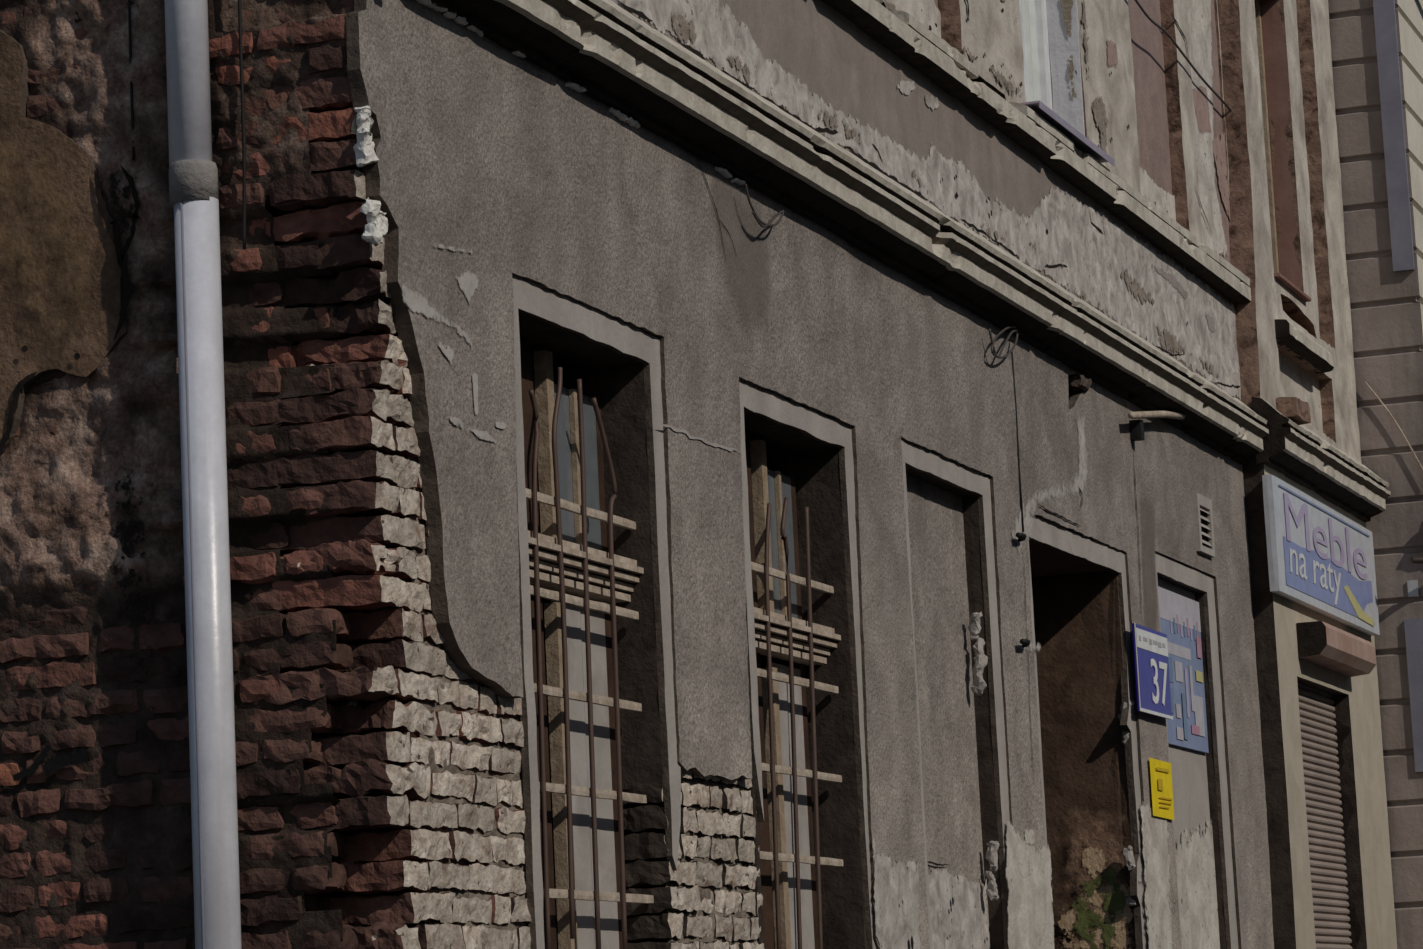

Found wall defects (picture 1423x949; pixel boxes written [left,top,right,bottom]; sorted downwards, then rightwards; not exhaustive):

flaking render [416,0,484,37]
flaking render [565,82,587,92]
peeling [609,0,1241,401]
flaking render [247,77,532,949]
crack [659,424,742,454]
flaking render [968,612,988,695]
flaking render [622,770,764,949]
peeling [872,801,1220,949]